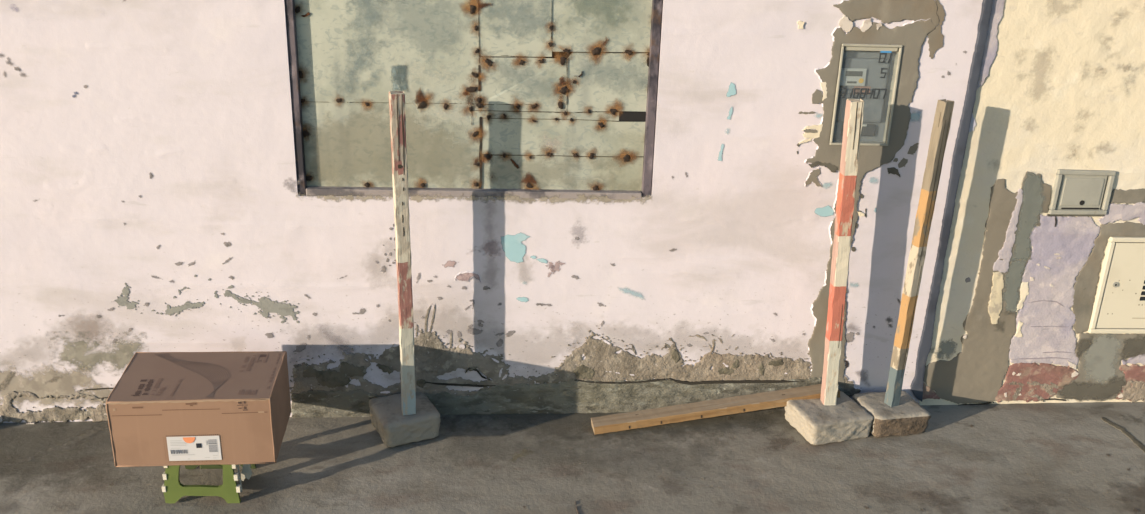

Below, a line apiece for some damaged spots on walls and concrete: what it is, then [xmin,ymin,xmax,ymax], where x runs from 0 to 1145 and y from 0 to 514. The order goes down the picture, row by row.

rust [462,0,489,31]
rust [589,38,609,61]
rust [514,25,578,123]
rust [415,89,431,109]
rust [462,48,539,140]
rust [472,152,539,190]
peeling [804,161,838,188]
peeling [97,283,149,318]
peeling [164,276,310,338]
flaking render [414,261,813,396]
flaking render [289,335,401,396]
flaking render [0,391,108,425]